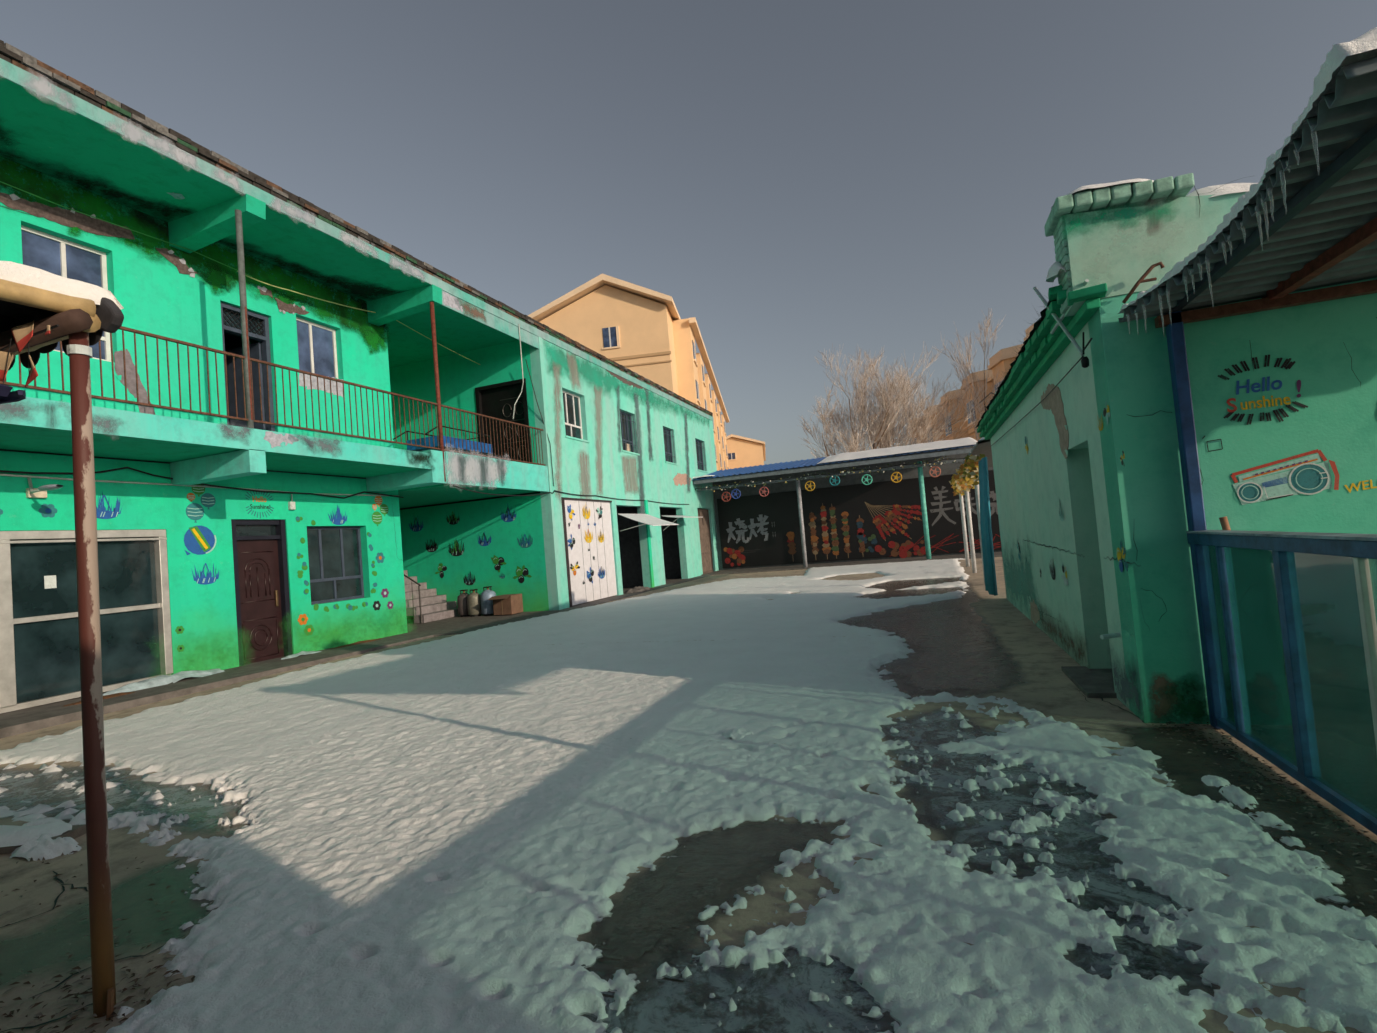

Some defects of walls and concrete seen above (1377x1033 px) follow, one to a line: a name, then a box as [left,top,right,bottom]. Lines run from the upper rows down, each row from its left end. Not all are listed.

spalling [0,192,135,239]
spalling [156,248,200,278]
damp [0,128,400,354]
peeling [114,348,155,415]
damp [547,346,709,514]